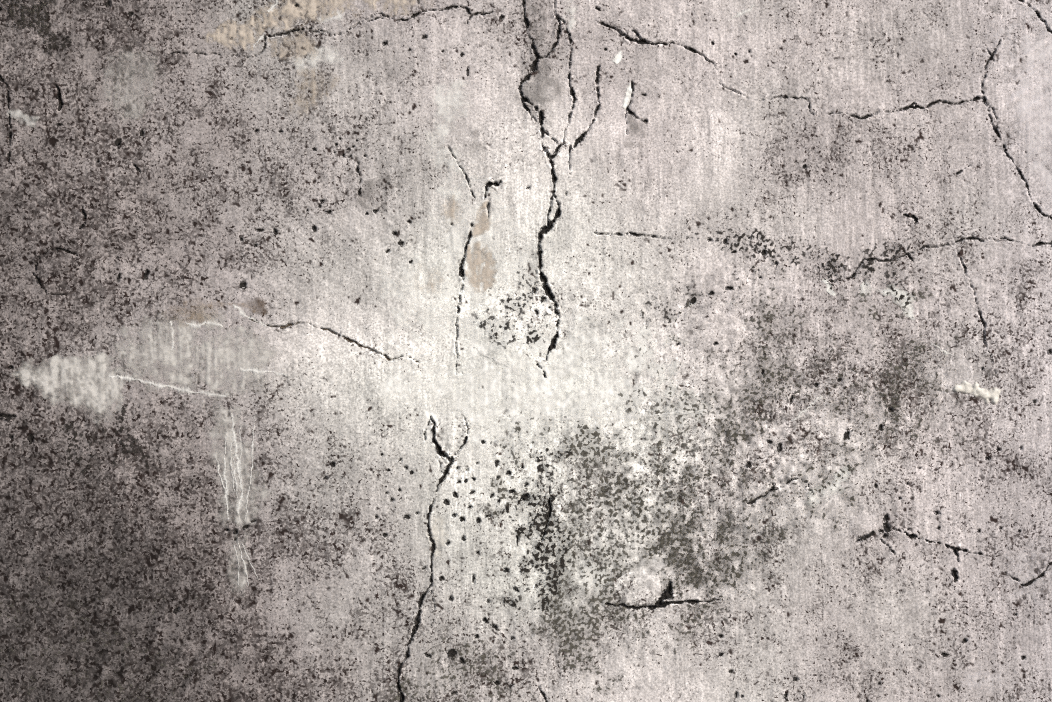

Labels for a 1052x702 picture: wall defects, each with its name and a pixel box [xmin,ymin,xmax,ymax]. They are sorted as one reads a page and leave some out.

crack [262,6,493,51]
crack [599,22,716,68]
crack [518,0,600,377]
crack [771,40,1052,373]
crack [449,148,501,367]
crack [251,319,418,362]
crack [397,416,468,702]
crack [607,583,719,610]
crack [881,529,982,582]
crack [1012,563,1052,587]